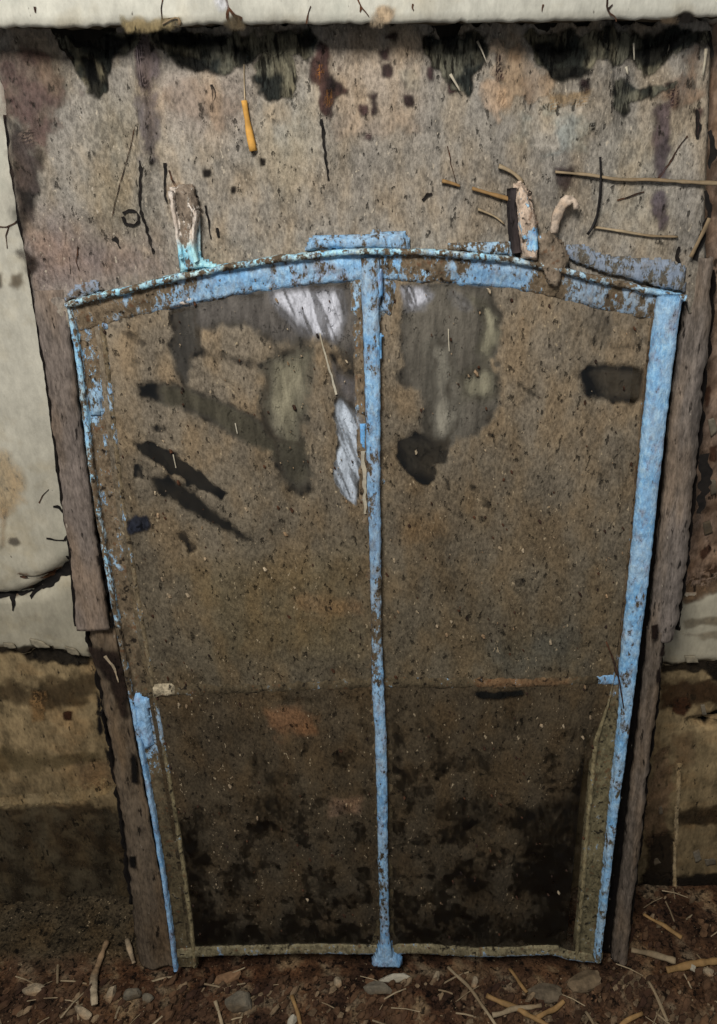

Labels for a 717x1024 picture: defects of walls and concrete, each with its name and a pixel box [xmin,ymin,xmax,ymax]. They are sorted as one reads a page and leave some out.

corrosion [309,42,348,117]